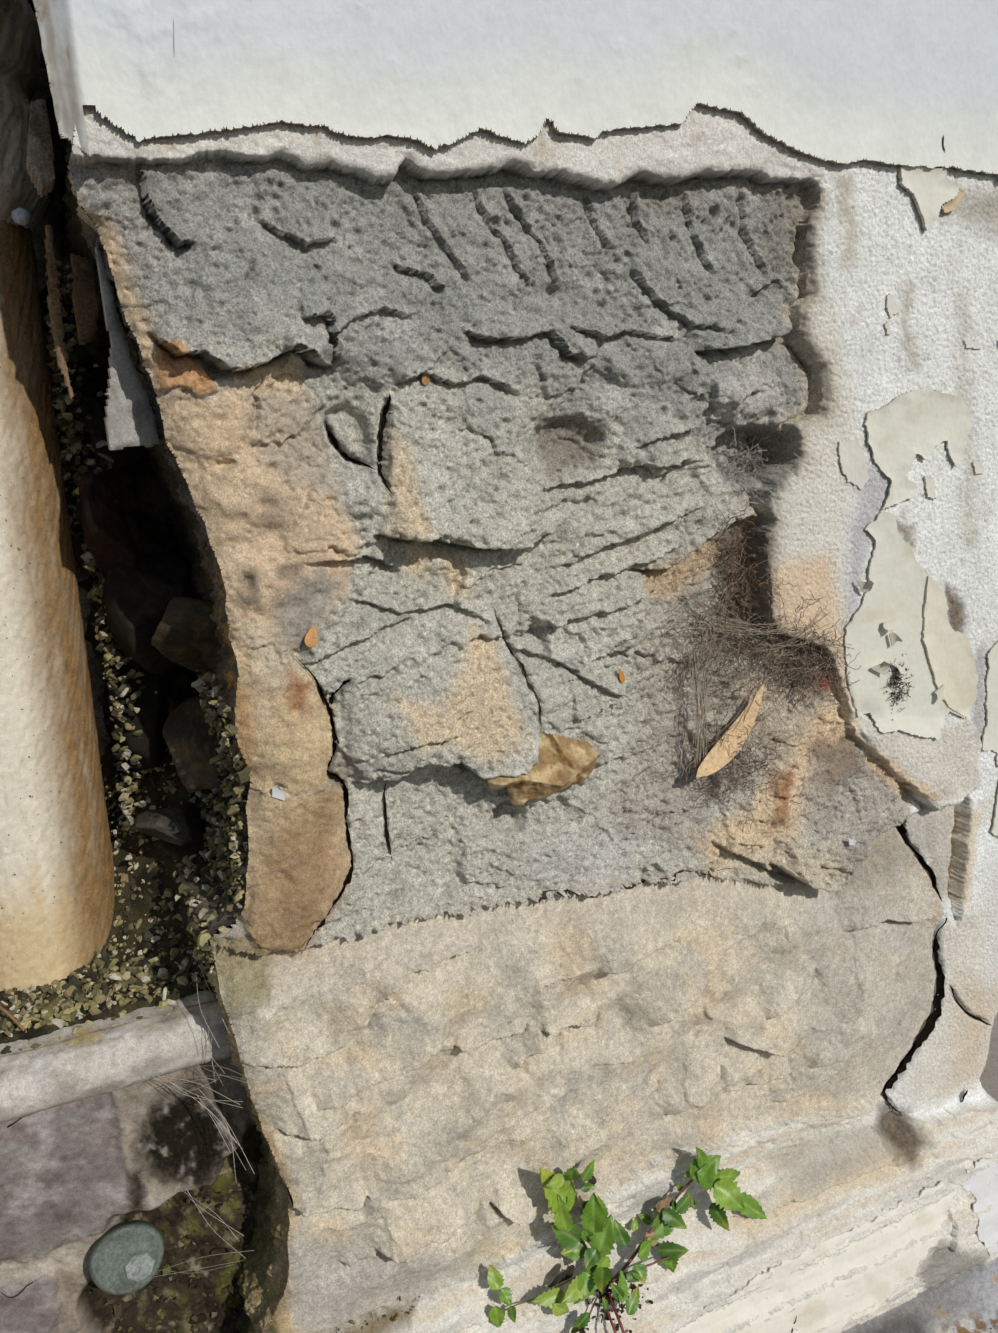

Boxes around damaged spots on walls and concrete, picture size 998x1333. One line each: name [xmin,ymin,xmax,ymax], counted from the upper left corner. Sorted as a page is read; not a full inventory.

crack [325,395,394,496]
spalling [69,154,998,956]
crack [292,653,354,946]
crack [383,780,393,861]
crack [882,821,991,1116]